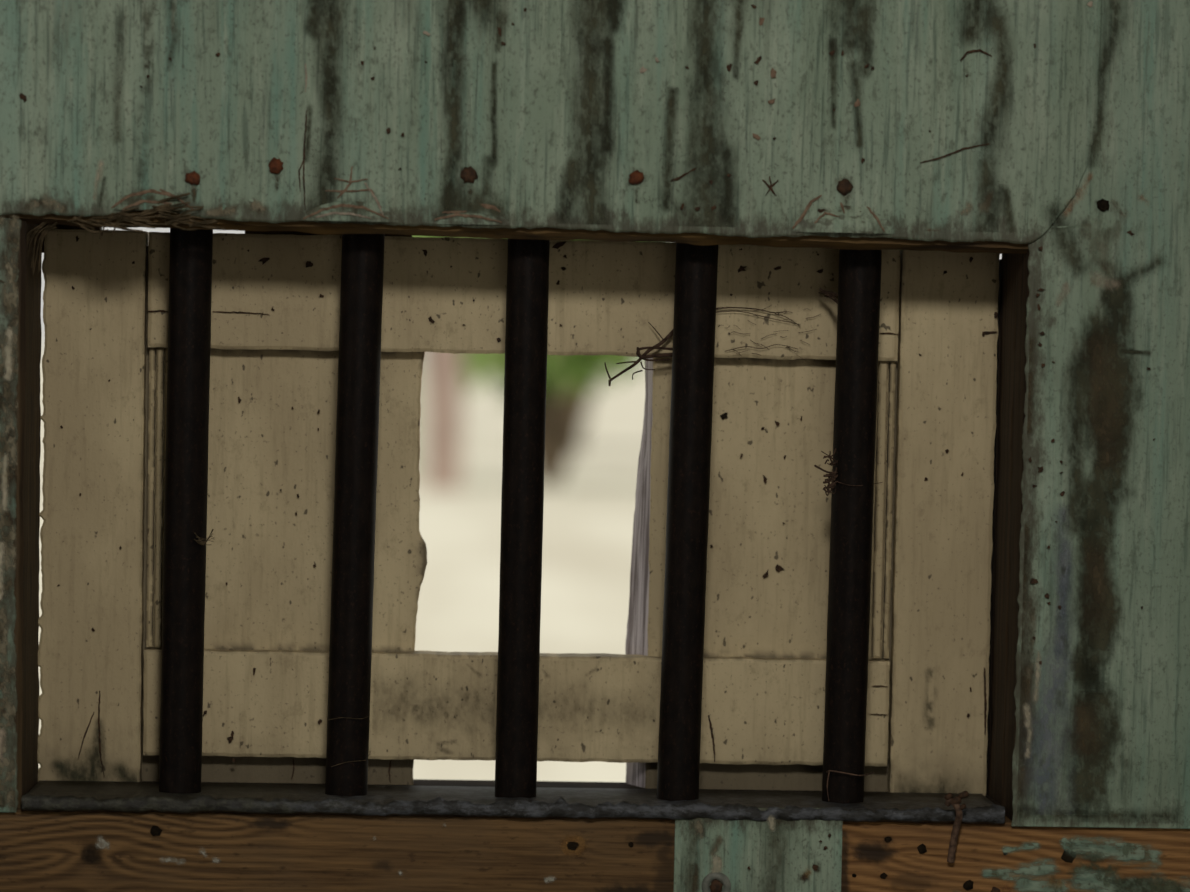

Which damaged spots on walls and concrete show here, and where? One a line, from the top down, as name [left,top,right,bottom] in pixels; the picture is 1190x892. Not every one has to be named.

leakage [305,0,342,209]
leakage [439,0,503,220]
leakage [559,0,622,225]
leakage [662,89,675,209]
leakage [689,0,735,227]
leakage [734,0,743,78]
leakage [963,0,1013,231]
leakage [1051,208,1082,272]
leakage [1017,259,1175,820]
peeling [983,843,1190,892]
peeling [1061,837,1161,864]